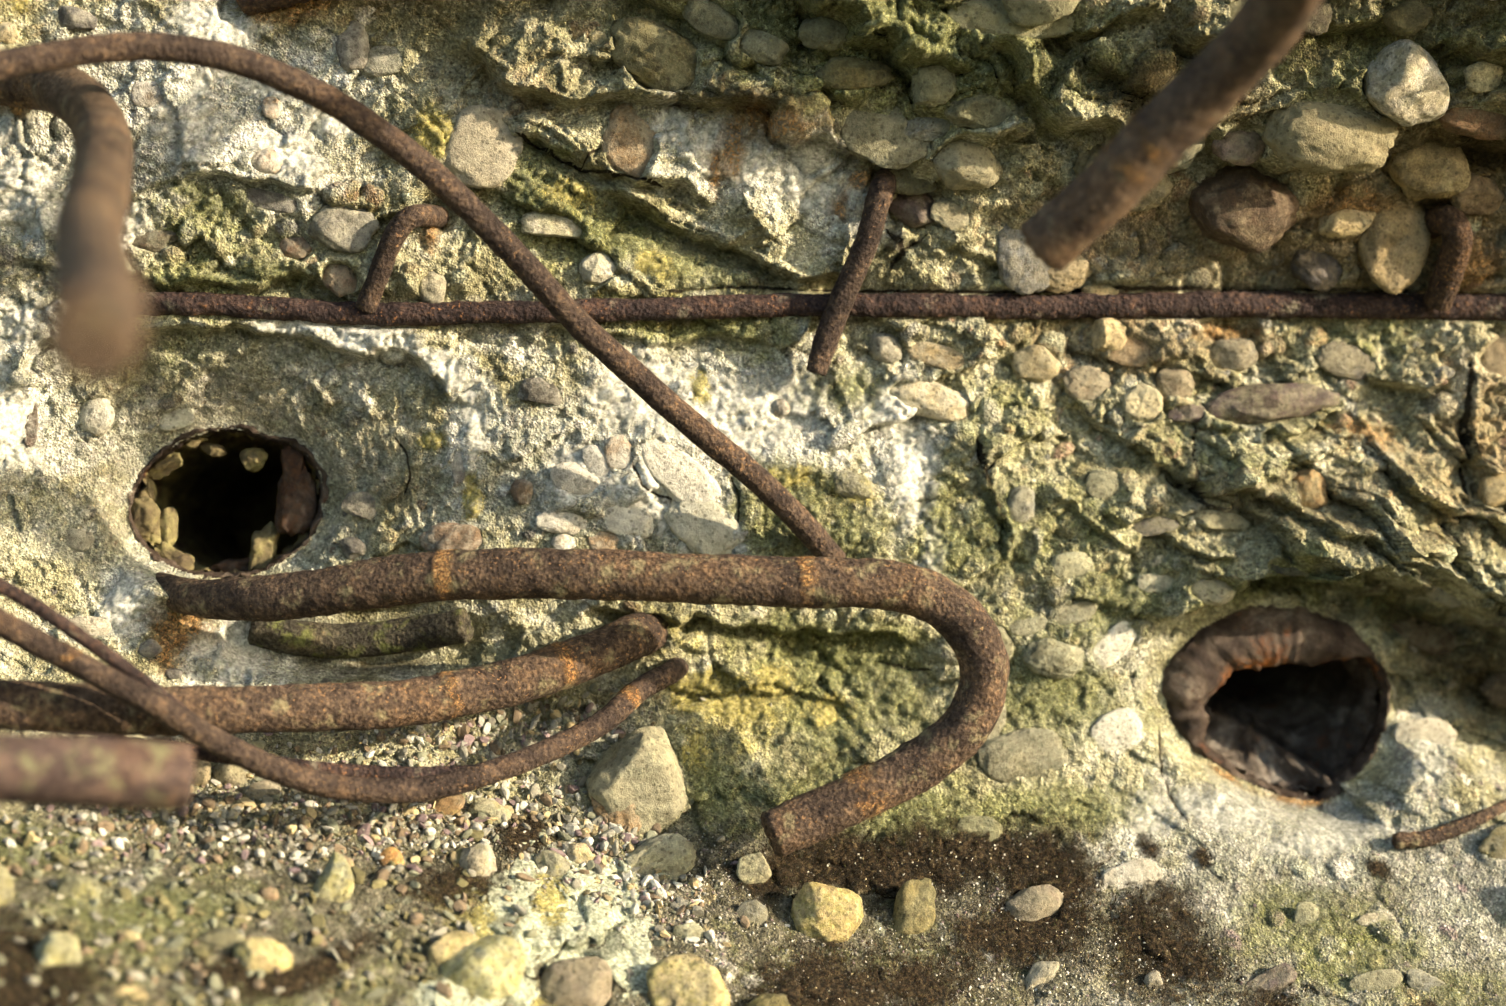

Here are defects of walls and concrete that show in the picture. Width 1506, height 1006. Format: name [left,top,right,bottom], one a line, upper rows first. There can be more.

crack [1441,359,1505,526]
corrosion [432,549,458,601]
corrosion [798,556,818,606]
corrosion [152,610,202,669]
corrosion [543,641,577,684]
corrosion [618,685,641,707]
peeling [671,666,856,730]
corrosion [1277,778,1330,806]